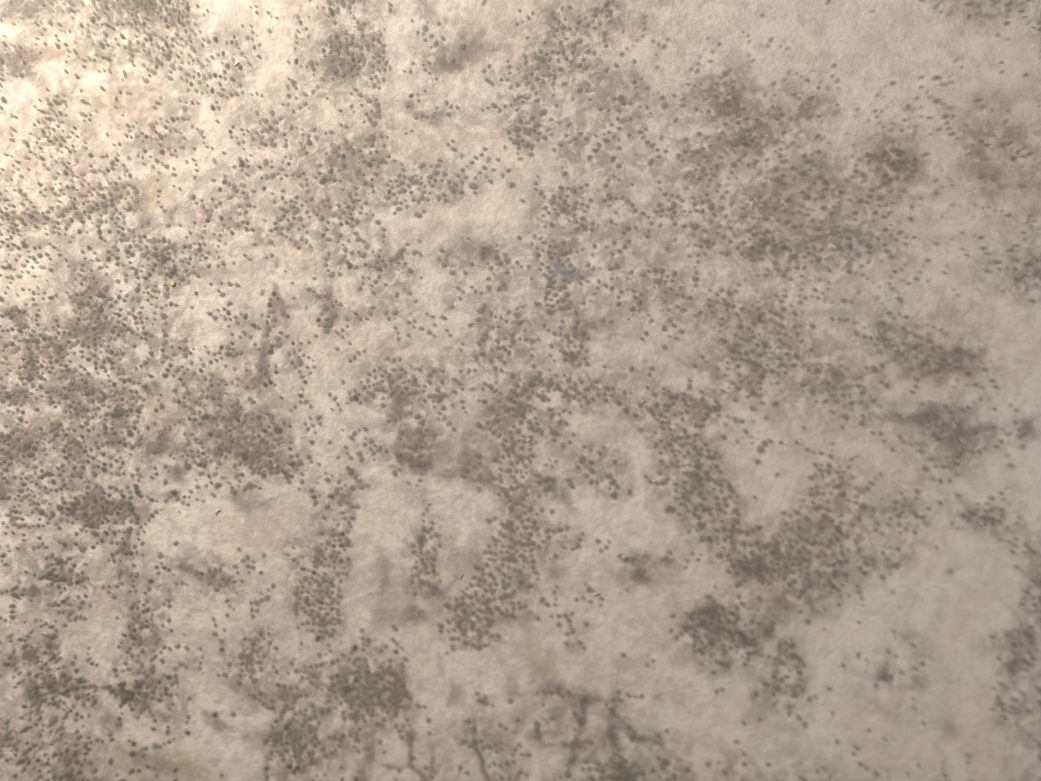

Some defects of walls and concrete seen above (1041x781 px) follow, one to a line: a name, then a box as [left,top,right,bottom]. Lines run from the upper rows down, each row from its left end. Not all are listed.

damp [341,2,928,709]
damp [554,713,691,781]